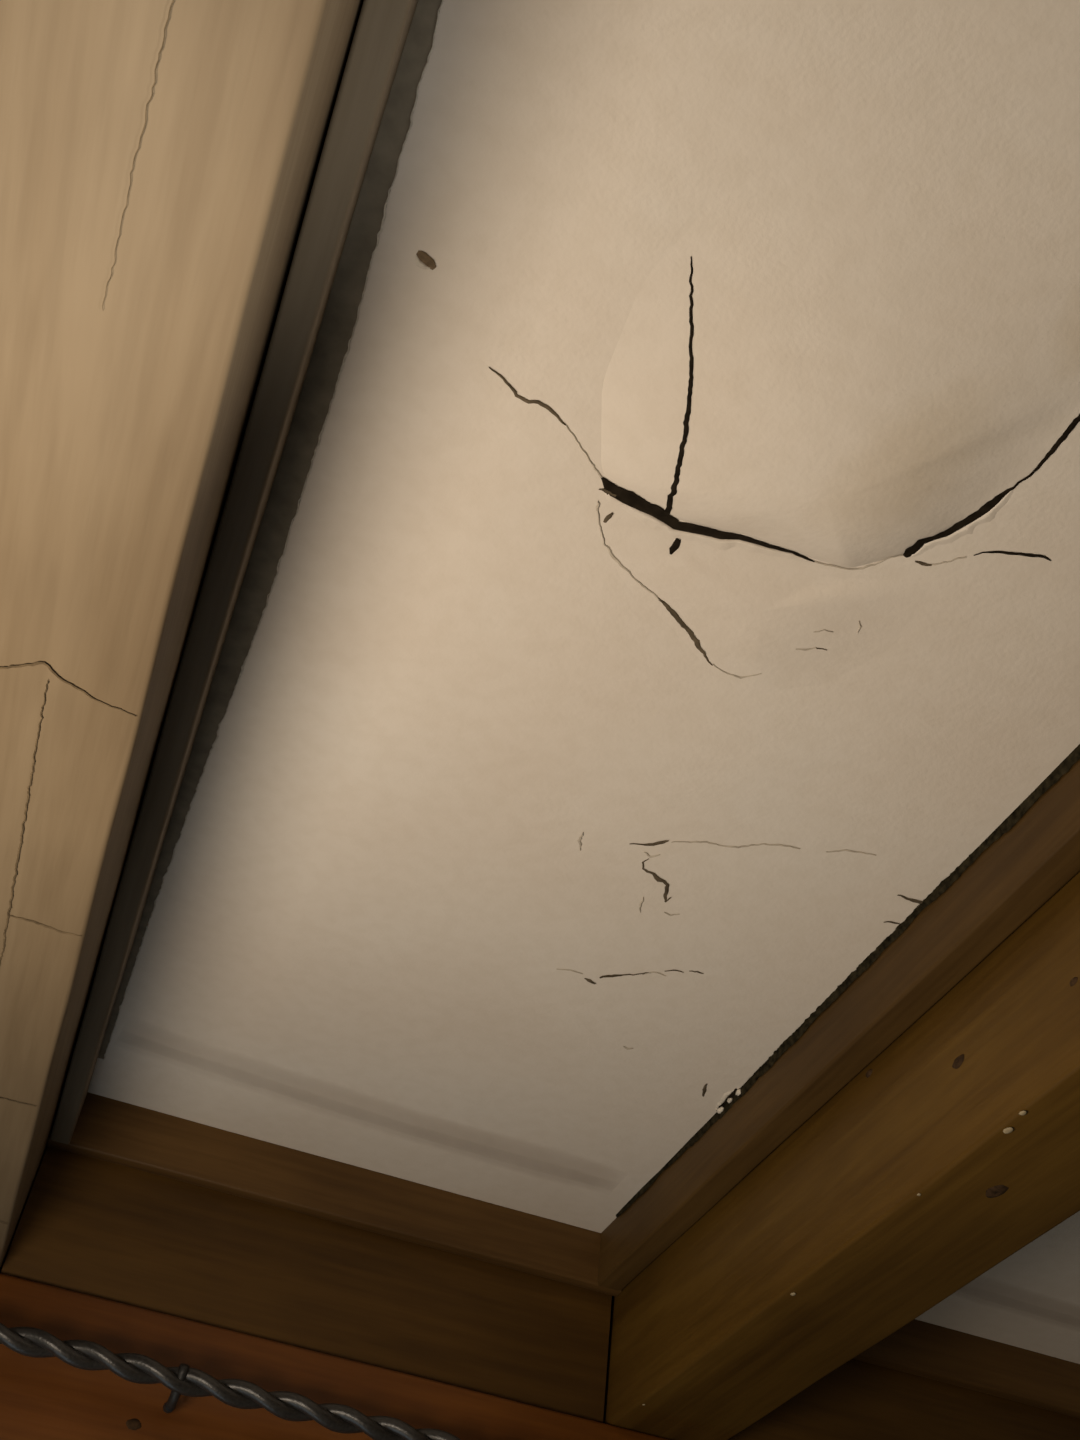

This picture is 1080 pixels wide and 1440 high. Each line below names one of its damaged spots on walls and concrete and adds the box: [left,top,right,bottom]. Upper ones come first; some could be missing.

crack [489,256,1080,679]
crack [631,840,876,916]
crack [557,969,703,984]